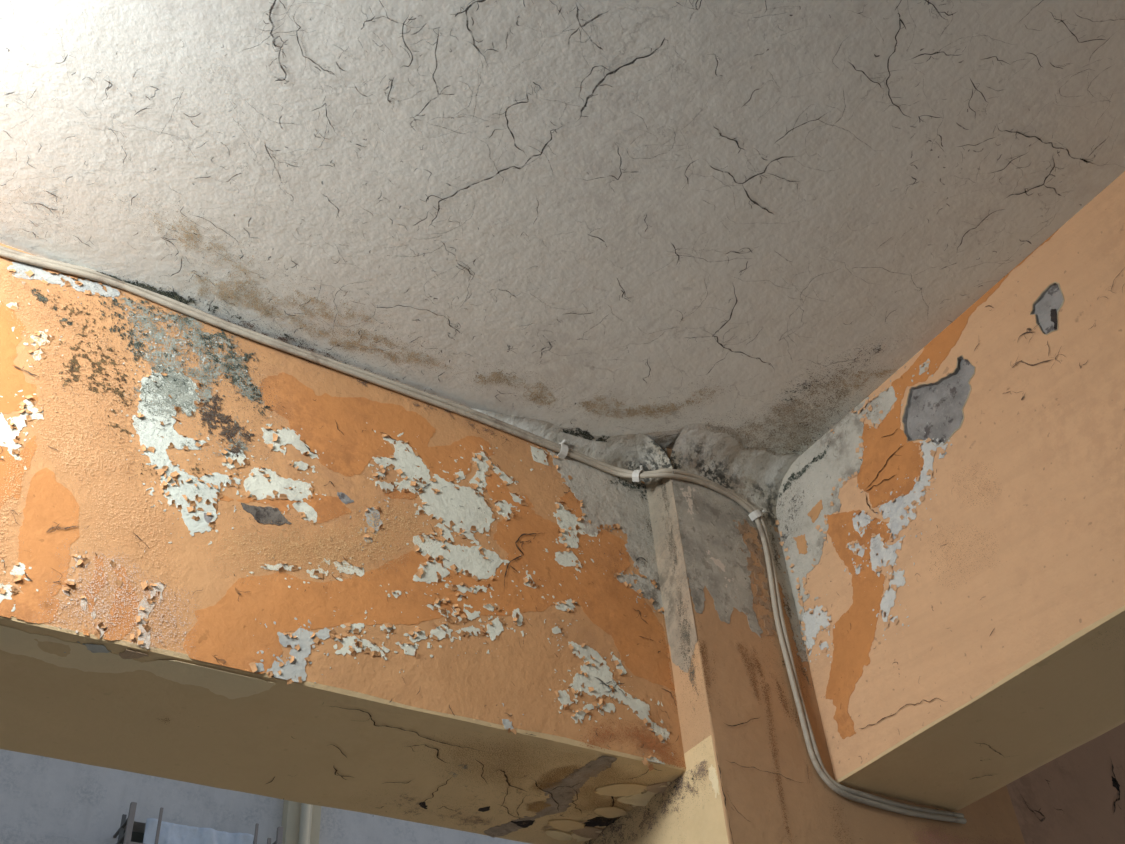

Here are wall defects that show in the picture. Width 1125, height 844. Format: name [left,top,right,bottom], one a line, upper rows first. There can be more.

crack [263,0,486,131]
crack [413,82,557,279]
crack [576,38,668,117]
crack [683,114,825,214]
crack [849,0,1106,269]
water stain [0,205,449,657]
peeling [0,230,1058,842]
water stain [561,428,618,442]
water stain [577,386,724,420]
water stain [610,477,721,714]
water stain [703,345,897,539]
spalling [1030,282,1064,335]